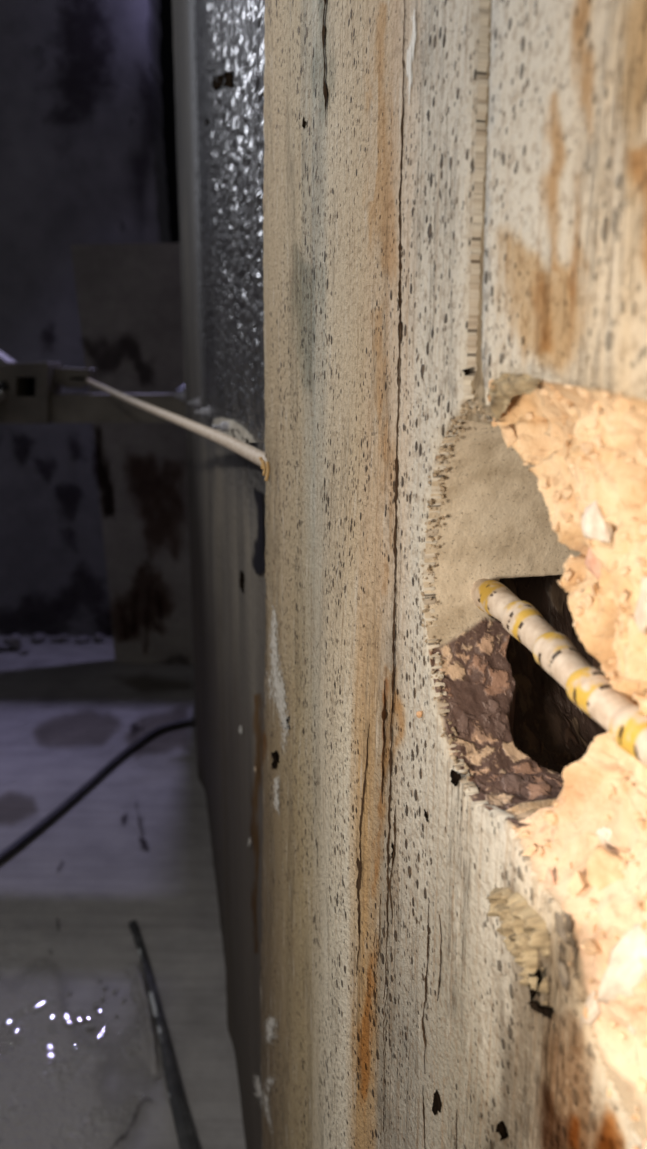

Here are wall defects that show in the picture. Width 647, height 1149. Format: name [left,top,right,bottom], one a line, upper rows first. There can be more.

crack [356,0,405,1144]
spalling [487,373,647,715]
crack [422,904,442,1148]
corrosion [543,1092,558,1149]
spalling [486,732,647,1149]